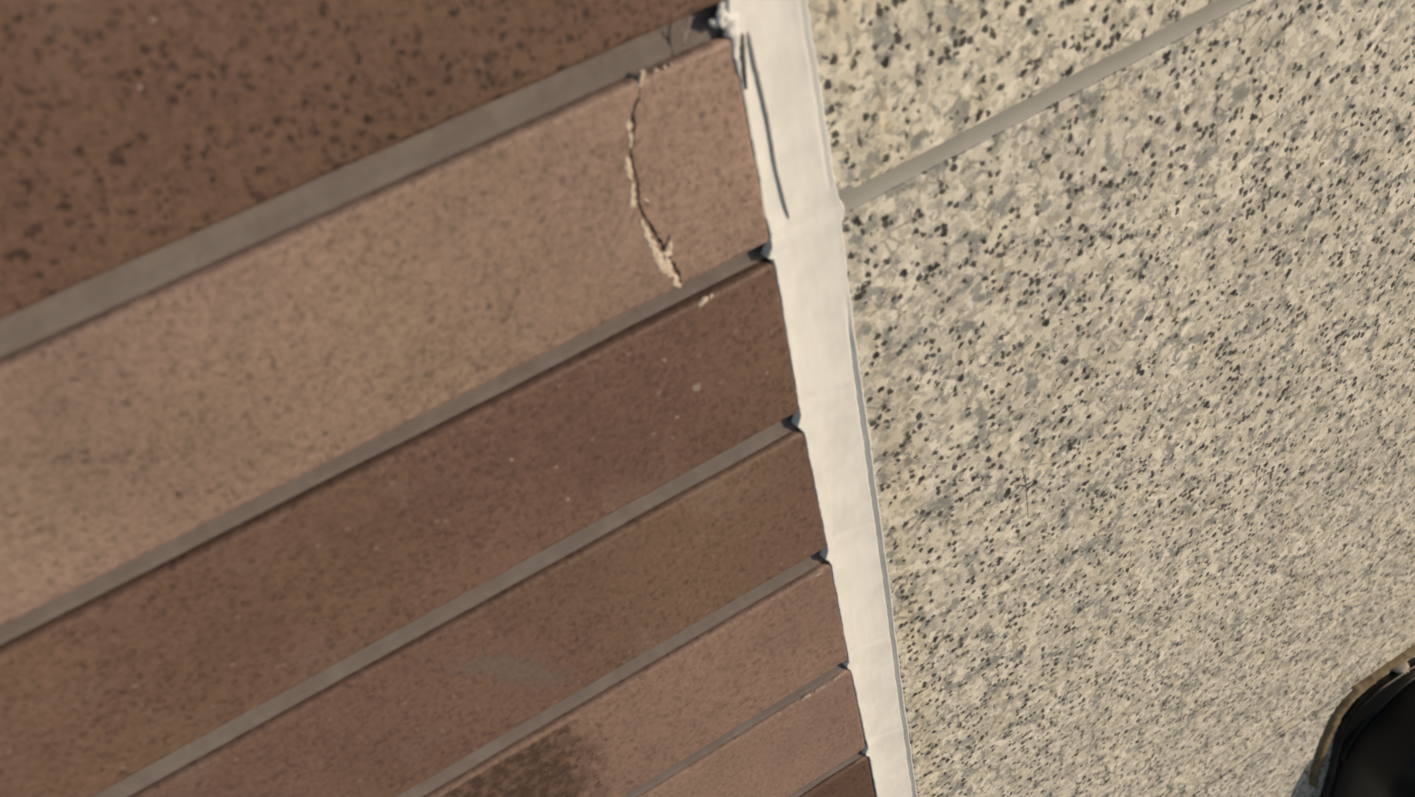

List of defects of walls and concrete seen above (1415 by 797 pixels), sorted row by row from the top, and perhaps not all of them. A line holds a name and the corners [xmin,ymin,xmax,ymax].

crack [624,69,681,288]